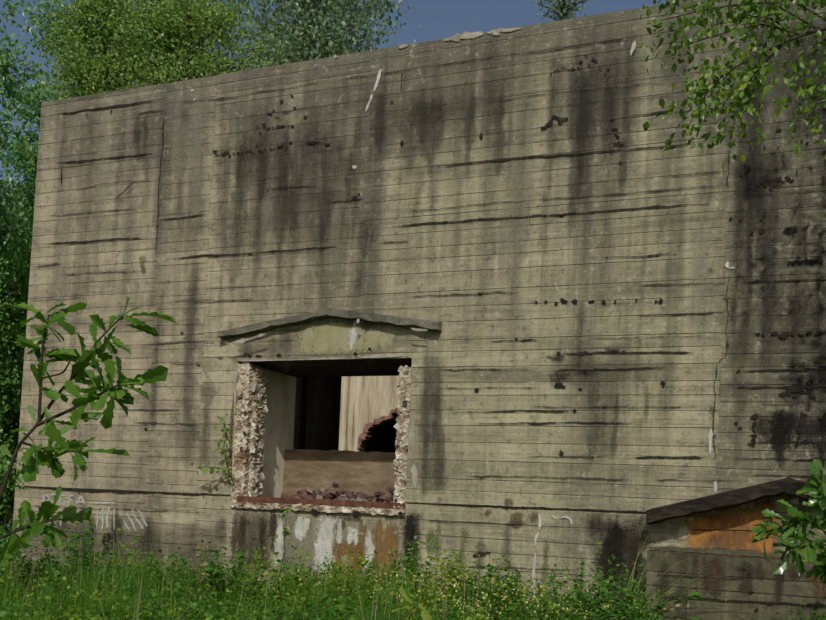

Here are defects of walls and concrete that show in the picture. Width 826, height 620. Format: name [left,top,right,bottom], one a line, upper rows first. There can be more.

flaking render [229,347,409,497]
spalling [357,370,418,515]
crack [439,279,826,481]
water stain [770,410,797,466]
peeling [269,509,375,583]
rust [326,513,399,584]
water stain [588,512,647,611]
rust [663,498,784,559]